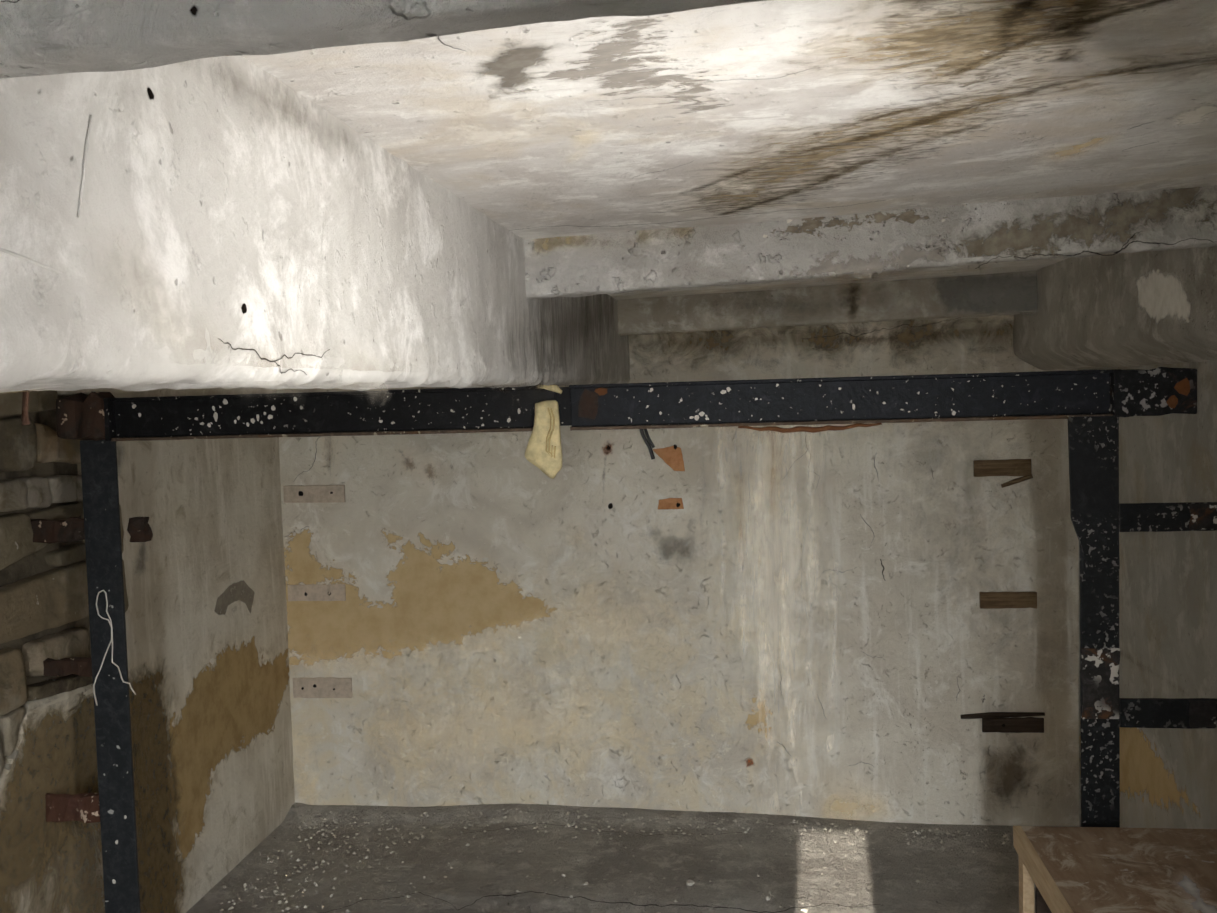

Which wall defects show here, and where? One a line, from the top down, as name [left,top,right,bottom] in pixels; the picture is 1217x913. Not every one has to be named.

leakage [478,15,724,118]
leakage [695,65,1166,214]
spalling [763,210,947,238]
peeling [1138,269,1190,323]
flaking render [0,390,98,913]
peeling [129,529,557,913]
peeling [1120,727,1201,817]